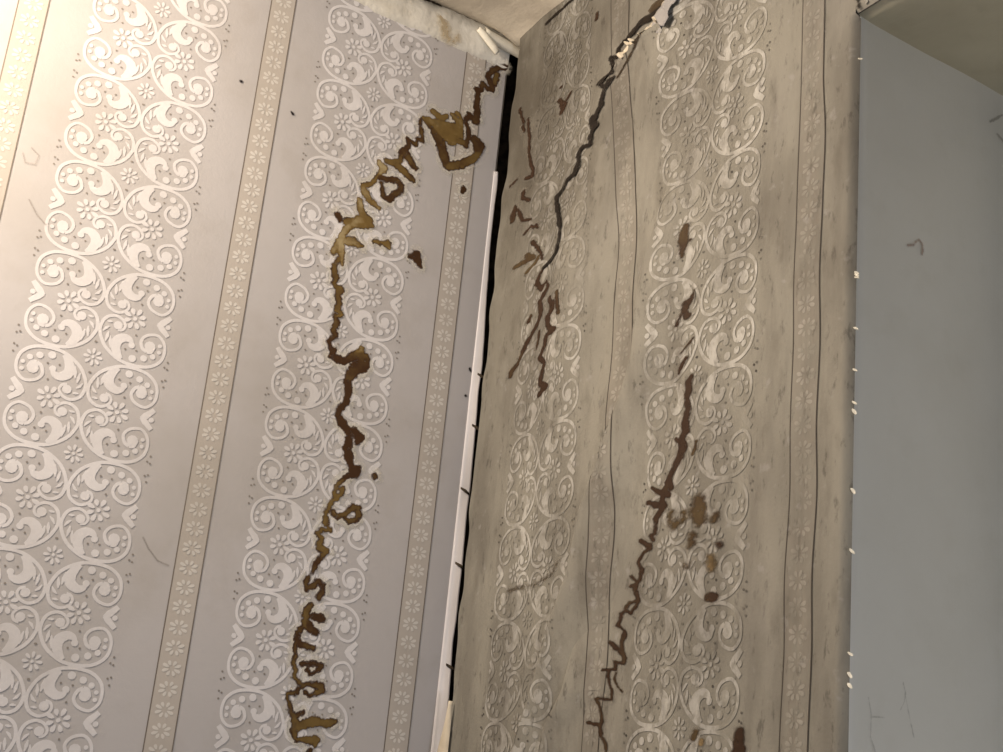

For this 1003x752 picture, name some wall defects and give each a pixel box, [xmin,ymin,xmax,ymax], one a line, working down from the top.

crack [449,54,518,701]
crack [541,0,664,270]